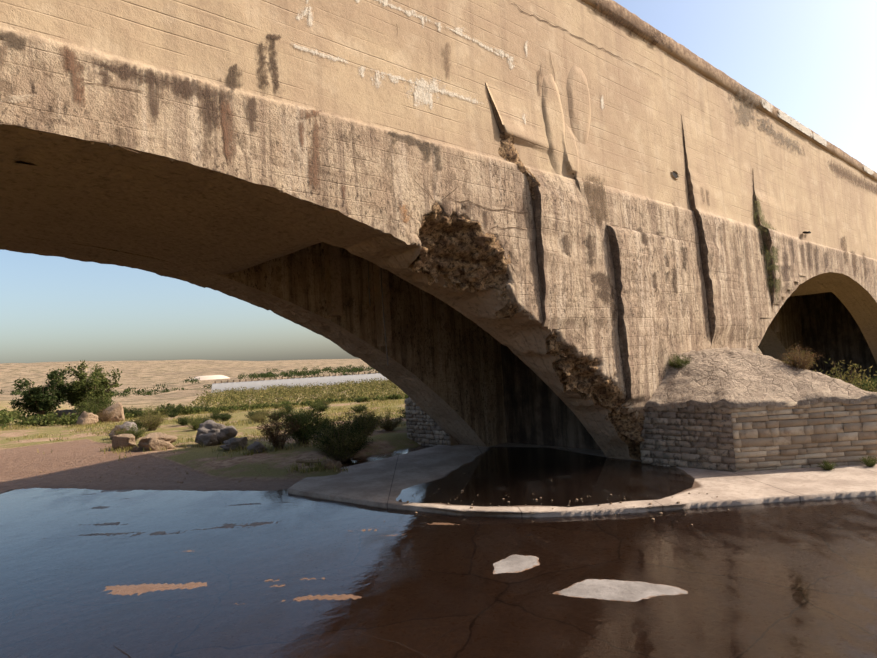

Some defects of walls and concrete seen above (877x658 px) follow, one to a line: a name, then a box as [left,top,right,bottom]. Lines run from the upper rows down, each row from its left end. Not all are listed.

leakage [0,31,27,64]
leakage [94,61,243,136]
leakage [246,34,281,132]
leakage [359,45,478,109]
efflorescence [376,0,513,69]
crack [511,3,660,76]
spalling [408,203,529,318]
crack [414,56,710,423]
leakage [581,175,622,320]
leakage [653,247,687,294]
leakage [781,241,829,285]
spalling [547,331,645,458]